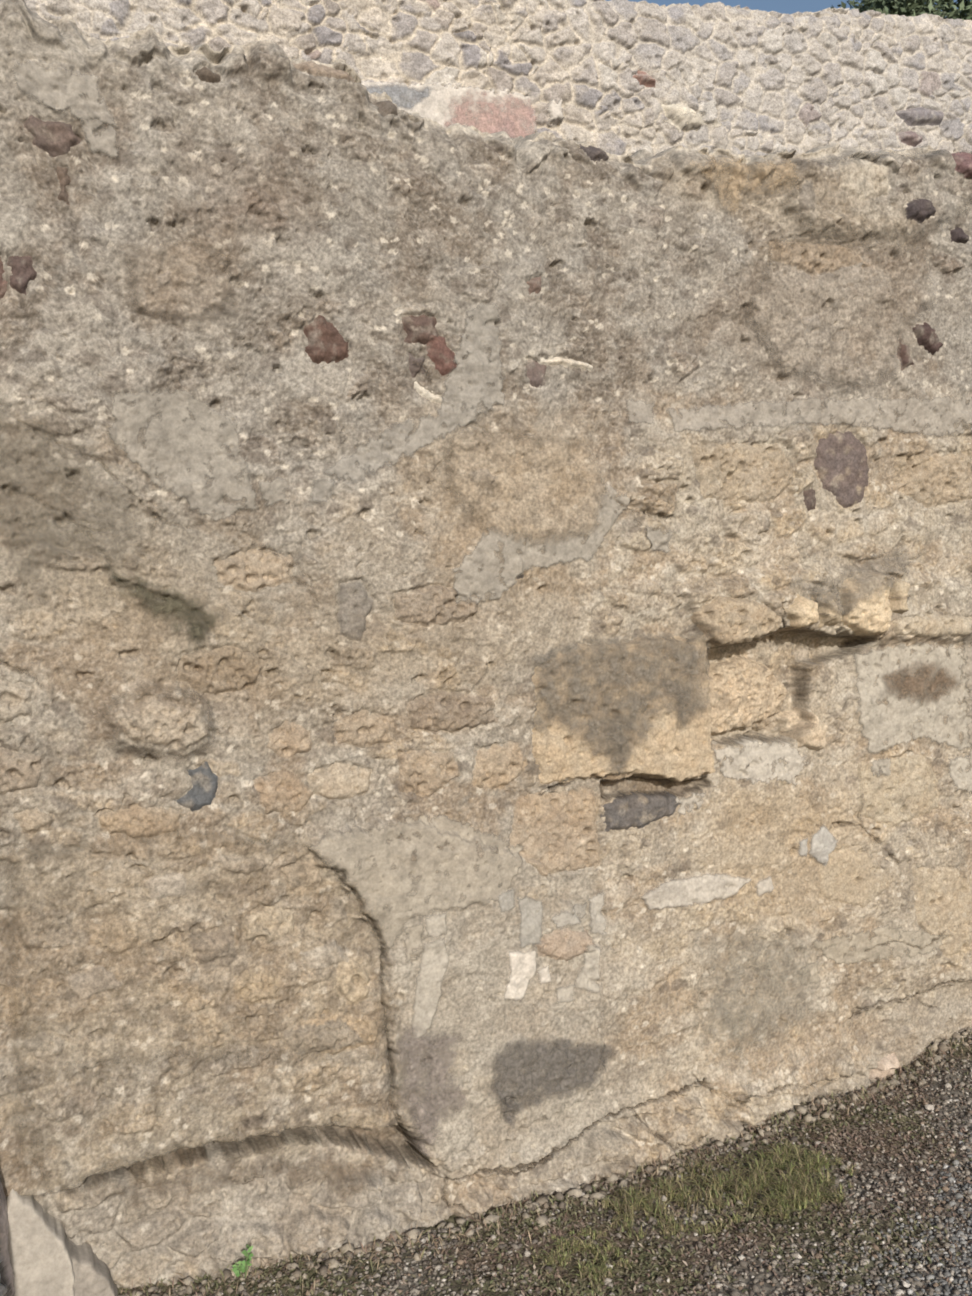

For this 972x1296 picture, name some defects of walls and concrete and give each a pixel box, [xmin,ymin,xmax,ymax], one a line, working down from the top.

crack [332,868,390,1061]
crack [859,981,954,1011]
damp [493,1040,612,1124]
crack [424,1078,712,1216]